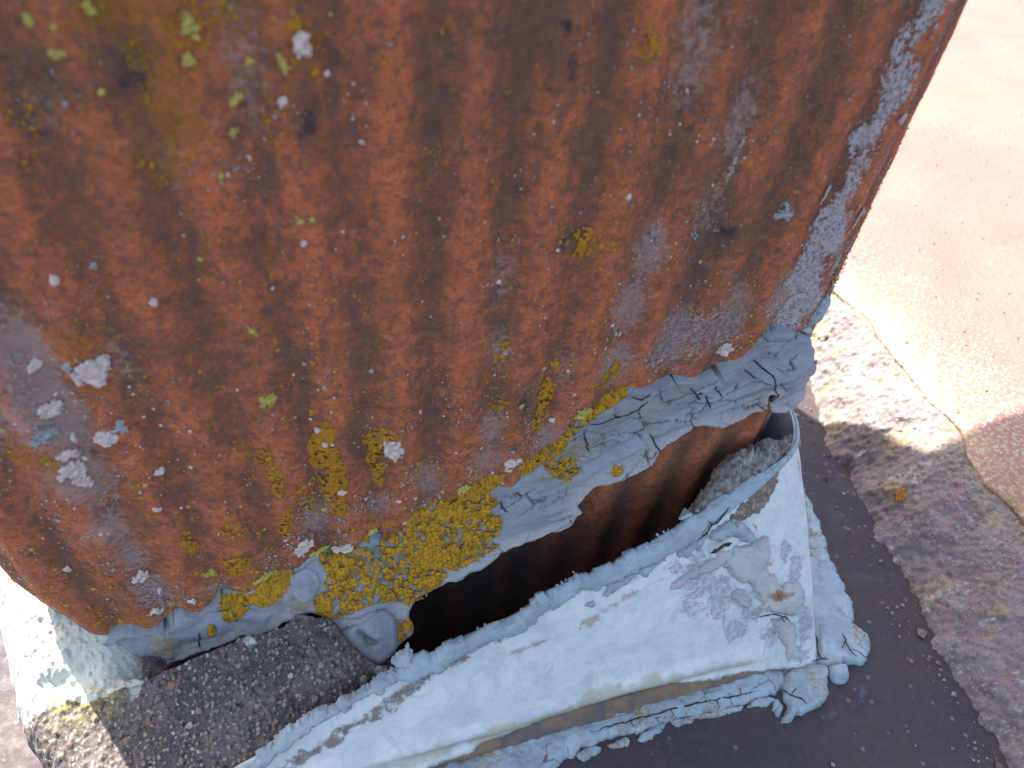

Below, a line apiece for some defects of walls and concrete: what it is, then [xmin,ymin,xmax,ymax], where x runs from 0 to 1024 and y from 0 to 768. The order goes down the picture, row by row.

crack [690,387,722,409]
crack [744,360,780,403]
crack [583,394,661,452]
crack [813,633,869,662]
crack [591,688,807,732]